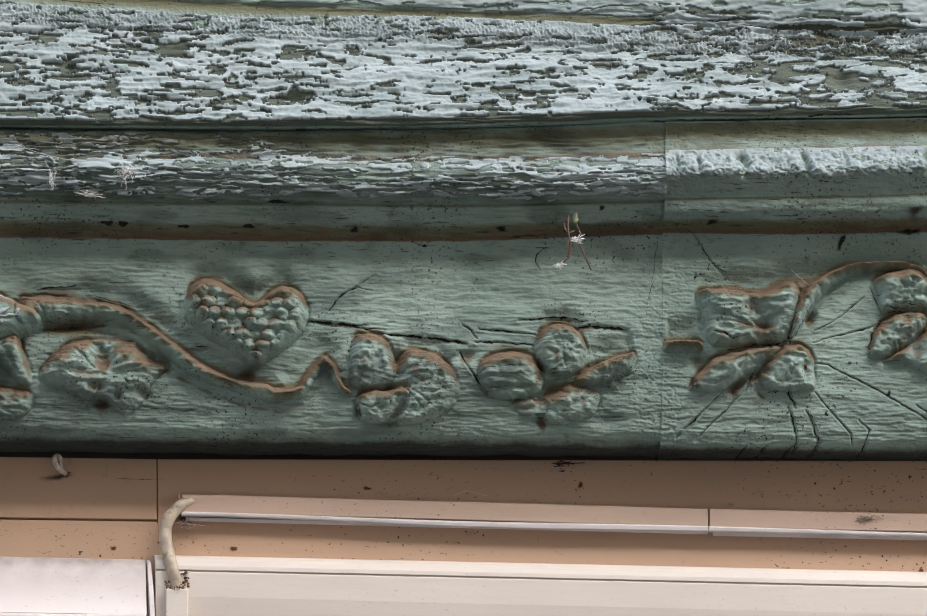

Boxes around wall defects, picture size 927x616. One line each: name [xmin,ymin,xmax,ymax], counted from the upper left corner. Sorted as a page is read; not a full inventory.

peeling [0,0,927,202]
peeling [0,295,20,324]
crack [307,274,625,394]
crack [677,288,927,436]
crack [739,389,870,456]